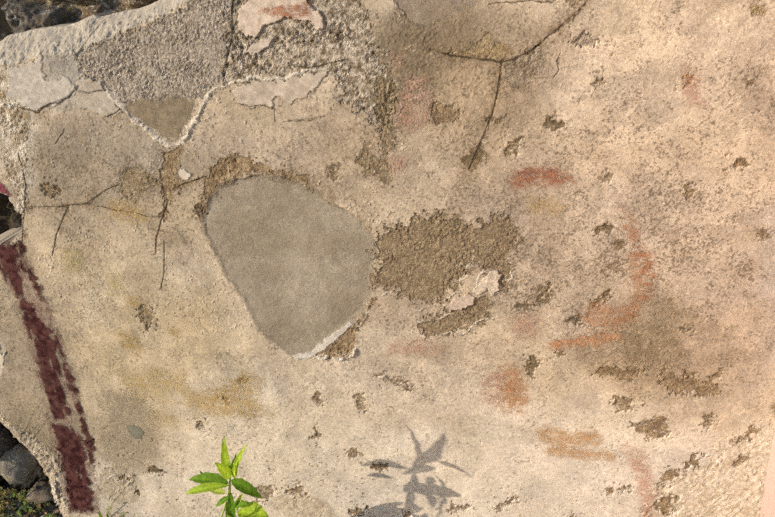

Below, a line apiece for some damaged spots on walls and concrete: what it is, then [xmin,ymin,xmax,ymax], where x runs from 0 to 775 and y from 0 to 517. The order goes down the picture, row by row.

crack [17,86,111,113]
crack [223,1,234,78]
peeling [72,0,406,188]
crack [431,6,584,168]
crack [20,161,205,286]
spalling [286,209,526,362]